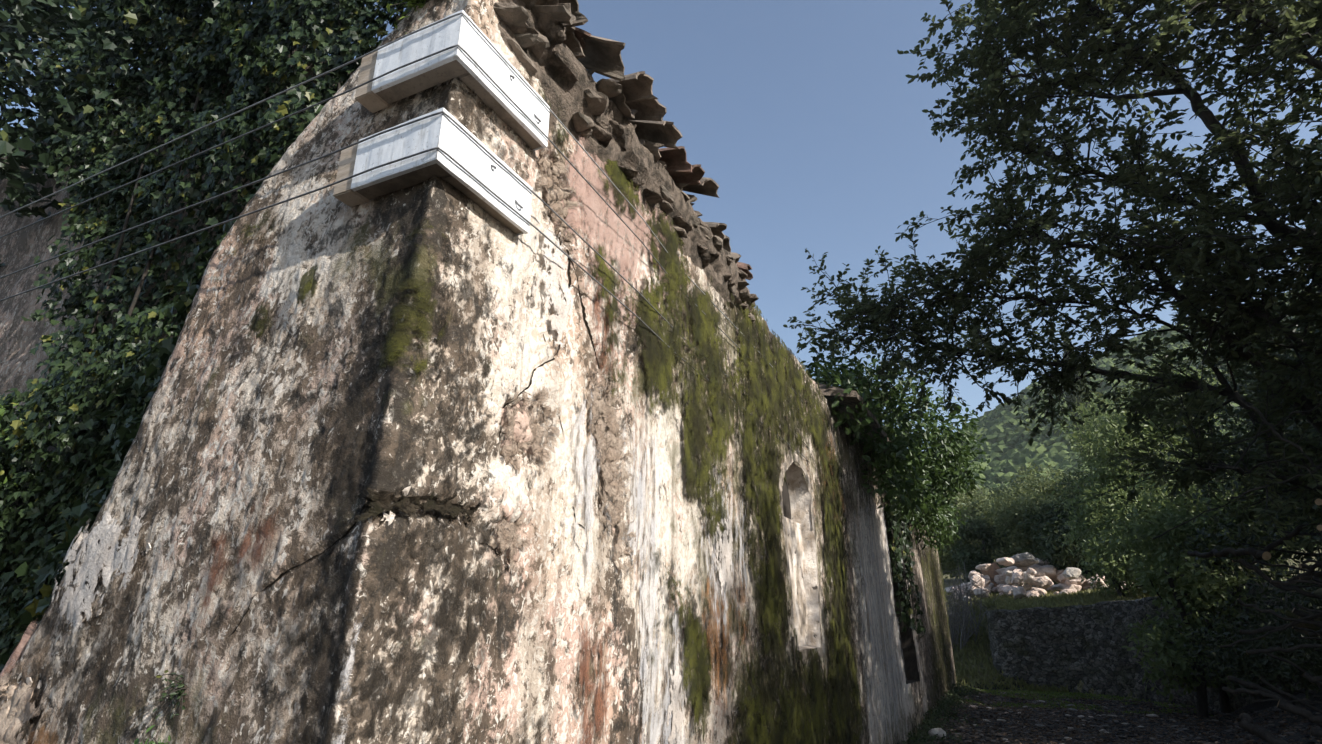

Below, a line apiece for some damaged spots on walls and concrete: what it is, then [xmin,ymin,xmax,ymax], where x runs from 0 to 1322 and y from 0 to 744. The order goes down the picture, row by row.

crack [499,201,601,438]
crack [232,491,467,634]
damp [269,195,494,744]
damp [622,424,747,744]
damp [522,714,552,744]